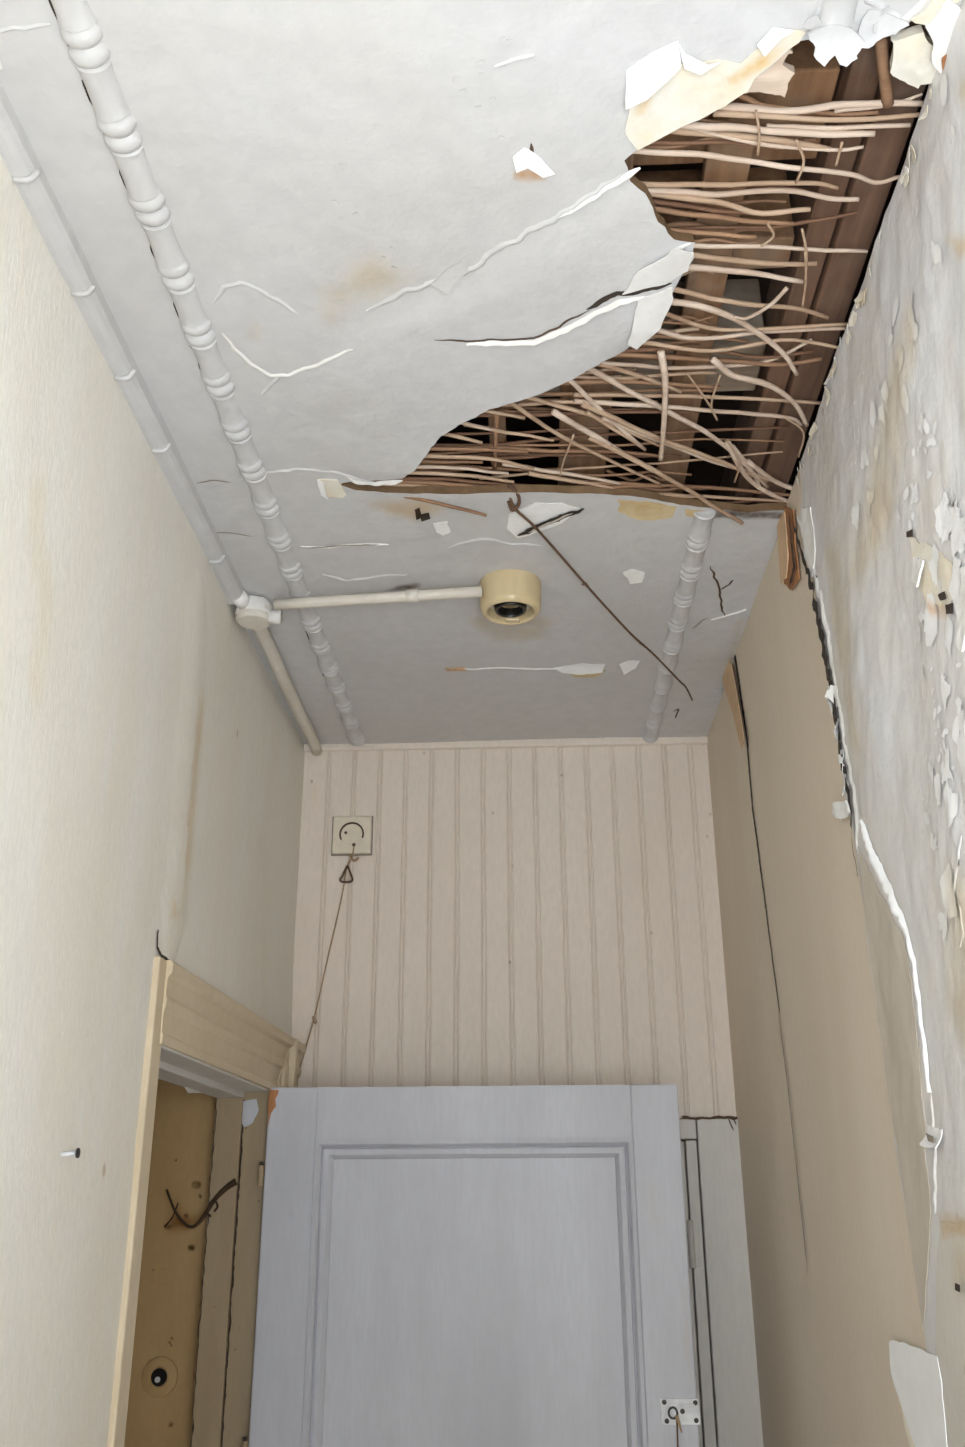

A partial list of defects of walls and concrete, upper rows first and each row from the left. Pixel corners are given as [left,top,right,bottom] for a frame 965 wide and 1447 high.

peeling [625,0,962,150]
peeling [513,143,555,178]
spalling [900,144,916,188]
crack [436,243,694,349]
spalling [796,422,817,484]
peeling [415,508,451,536]
spalling [507,503,584,538]
crack [692,566,746,629]
peeling [824,264,965,941]
peeling [450,660,640,677]
crack [734,655,808,1272]
flaking render [858,849,932,1330]